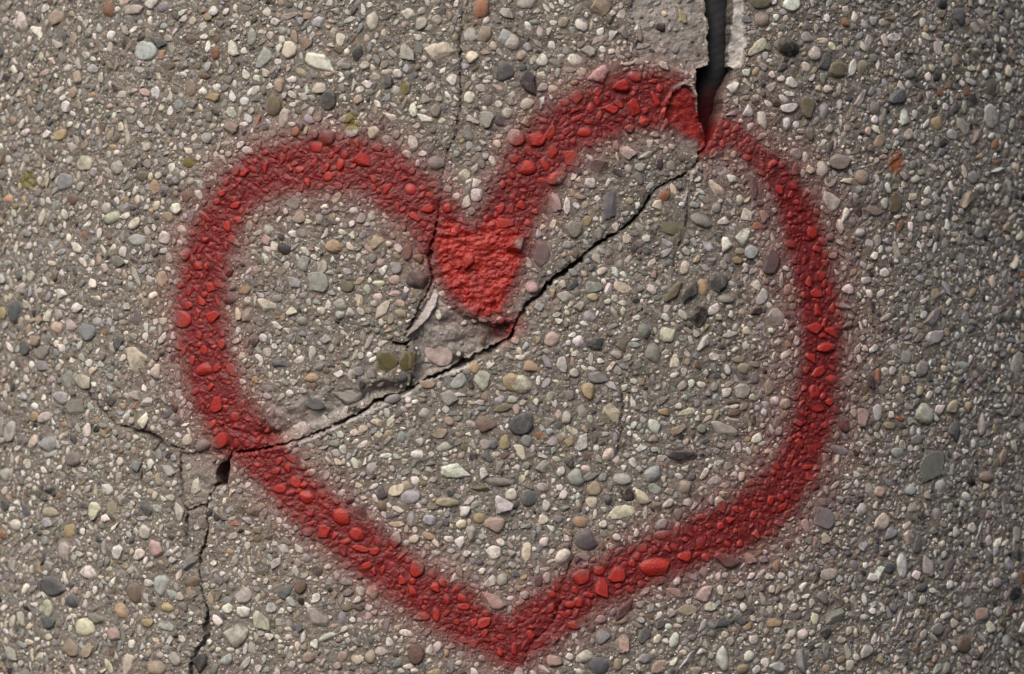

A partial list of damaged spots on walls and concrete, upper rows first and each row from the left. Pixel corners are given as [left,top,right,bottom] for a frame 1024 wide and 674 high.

spalling [628,0,709,158]
spalling [727,0,748,68]
crack [88,0,734,674]